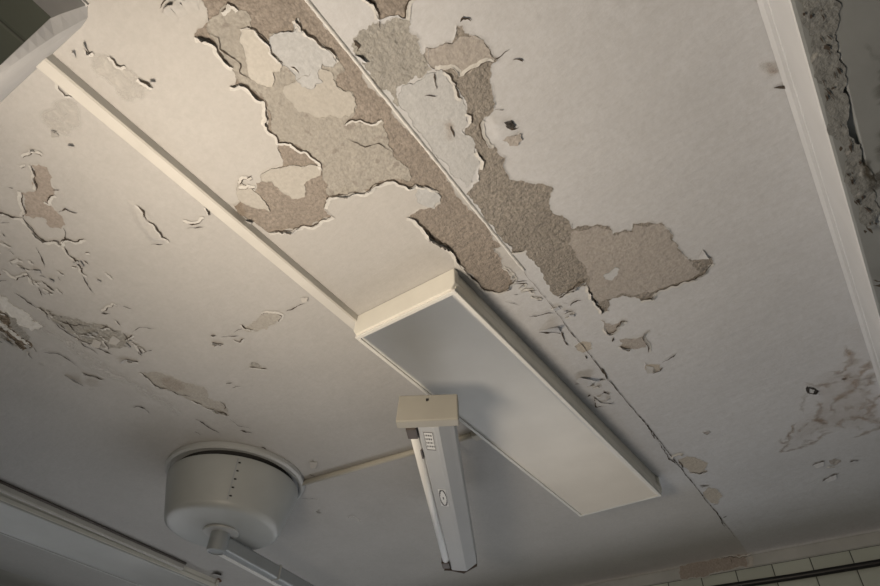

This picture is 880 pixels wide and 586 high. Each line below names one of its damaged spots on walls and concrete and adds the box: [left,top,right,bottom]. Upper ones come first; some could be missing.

peeling [17,150,74,230]
peeling [160,0,715,374]
peeling [799,0,880,233]
spalling [0,296,75,365]
crack [0,212,152,355]
peeling [120,359,230,417]
crack [505,274,735,537]